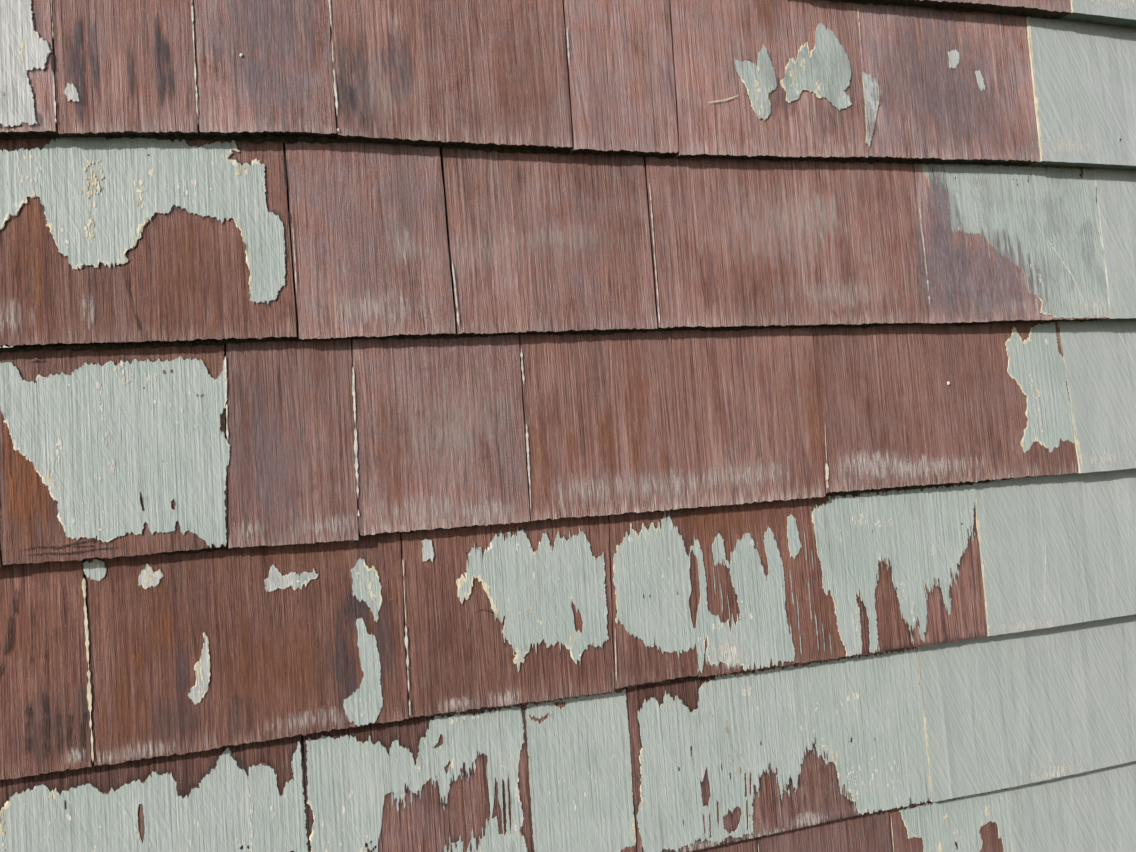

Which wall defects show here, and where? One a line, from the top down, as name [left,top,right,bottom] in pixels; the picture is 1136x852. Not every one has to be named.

peeling [0,0,51,127]
peeling [64,83,79,102]
peeling [734,23,880,147]
peeling [0,137,286,304]
peeling [921,164,1111,453]
peeling [0,356,230,548]
peeling [0,484,1013,852]